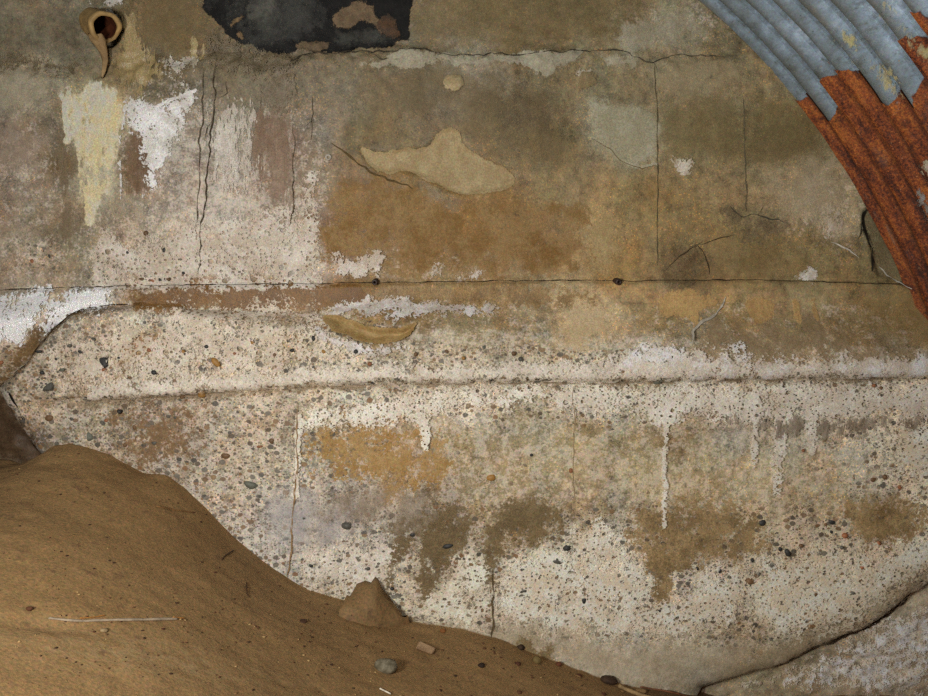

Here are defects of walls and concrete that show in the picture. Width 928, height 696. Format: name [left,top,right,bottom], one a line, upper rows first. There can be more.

leakage [360,48,593,110]
crack [287,47,721,68]
leakage [57,0,205,248]
leakage [204,96,262,196]
leakage [587,97,661,169]
leakage [670,155,694,175]
corrosion [795,11,928,320]
crack [0,58,392,420]
crack [414,277,656,285]
crack [812,209,912,289]
leakage [0,171,928,696]
crack [779,580,928,666]